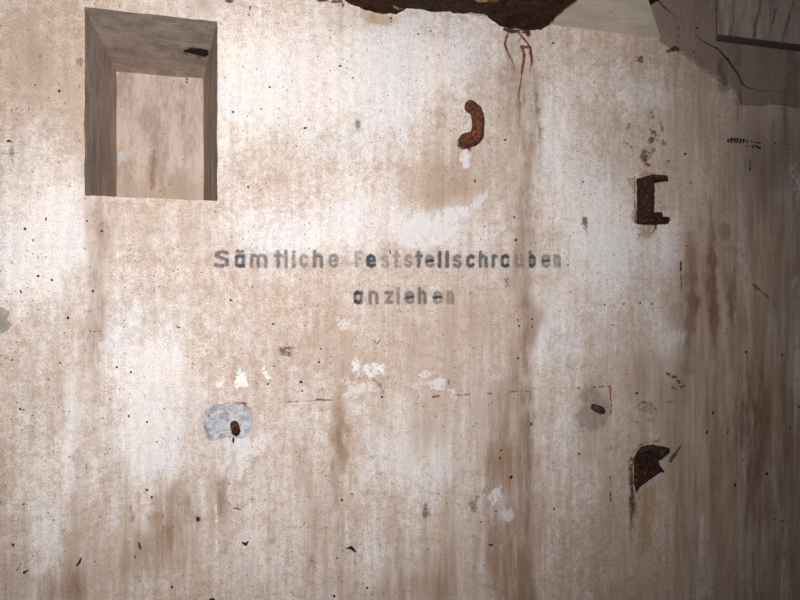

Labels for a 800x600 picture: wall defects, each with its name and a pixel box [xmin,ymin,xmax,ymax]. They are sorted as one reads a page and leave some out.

corrosion [503,27,533,110]